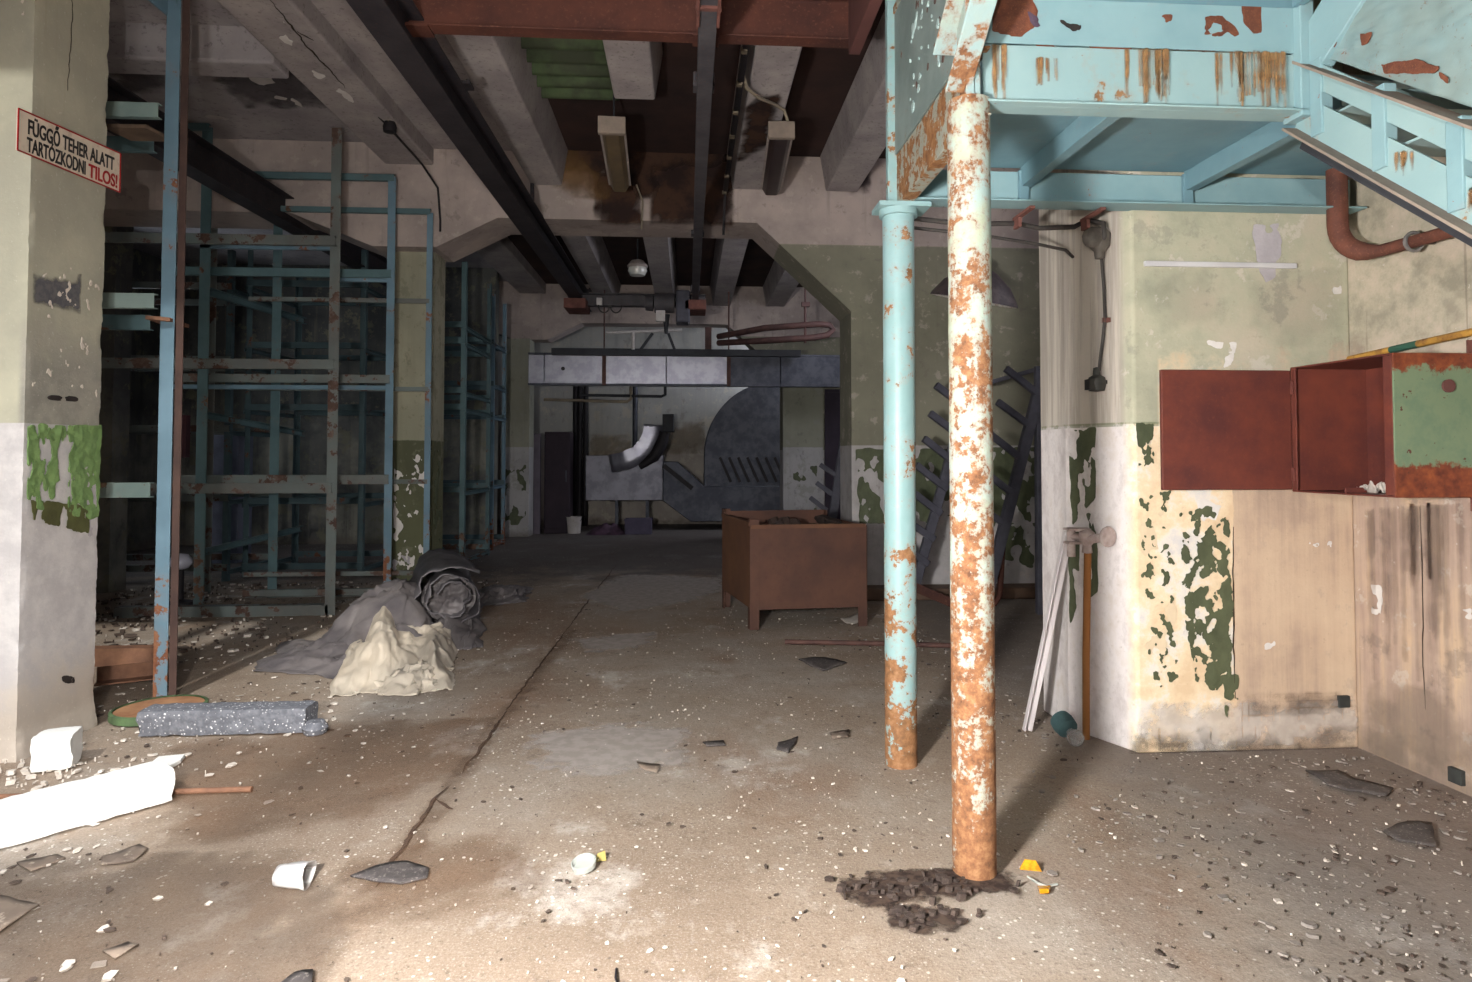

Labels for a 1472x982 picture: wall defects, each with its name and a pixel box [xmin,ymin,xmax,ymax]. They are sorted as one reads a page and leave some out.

rust [992,0,1057,99]
rust [1060,20,1081,31]
rust [1089,46,1169,103]
rust [1194,6,1286,108]
rust [1381,59,1448,83]
spalling [32,337,97,402]
peeling [27,423,102,537]
spalling [392,454,424,580]
peeling [1068,427,1098,623]
peeling [1136,422,1154,466]
peeling [1139,491,1239,717]
crack [376,564,617,887]